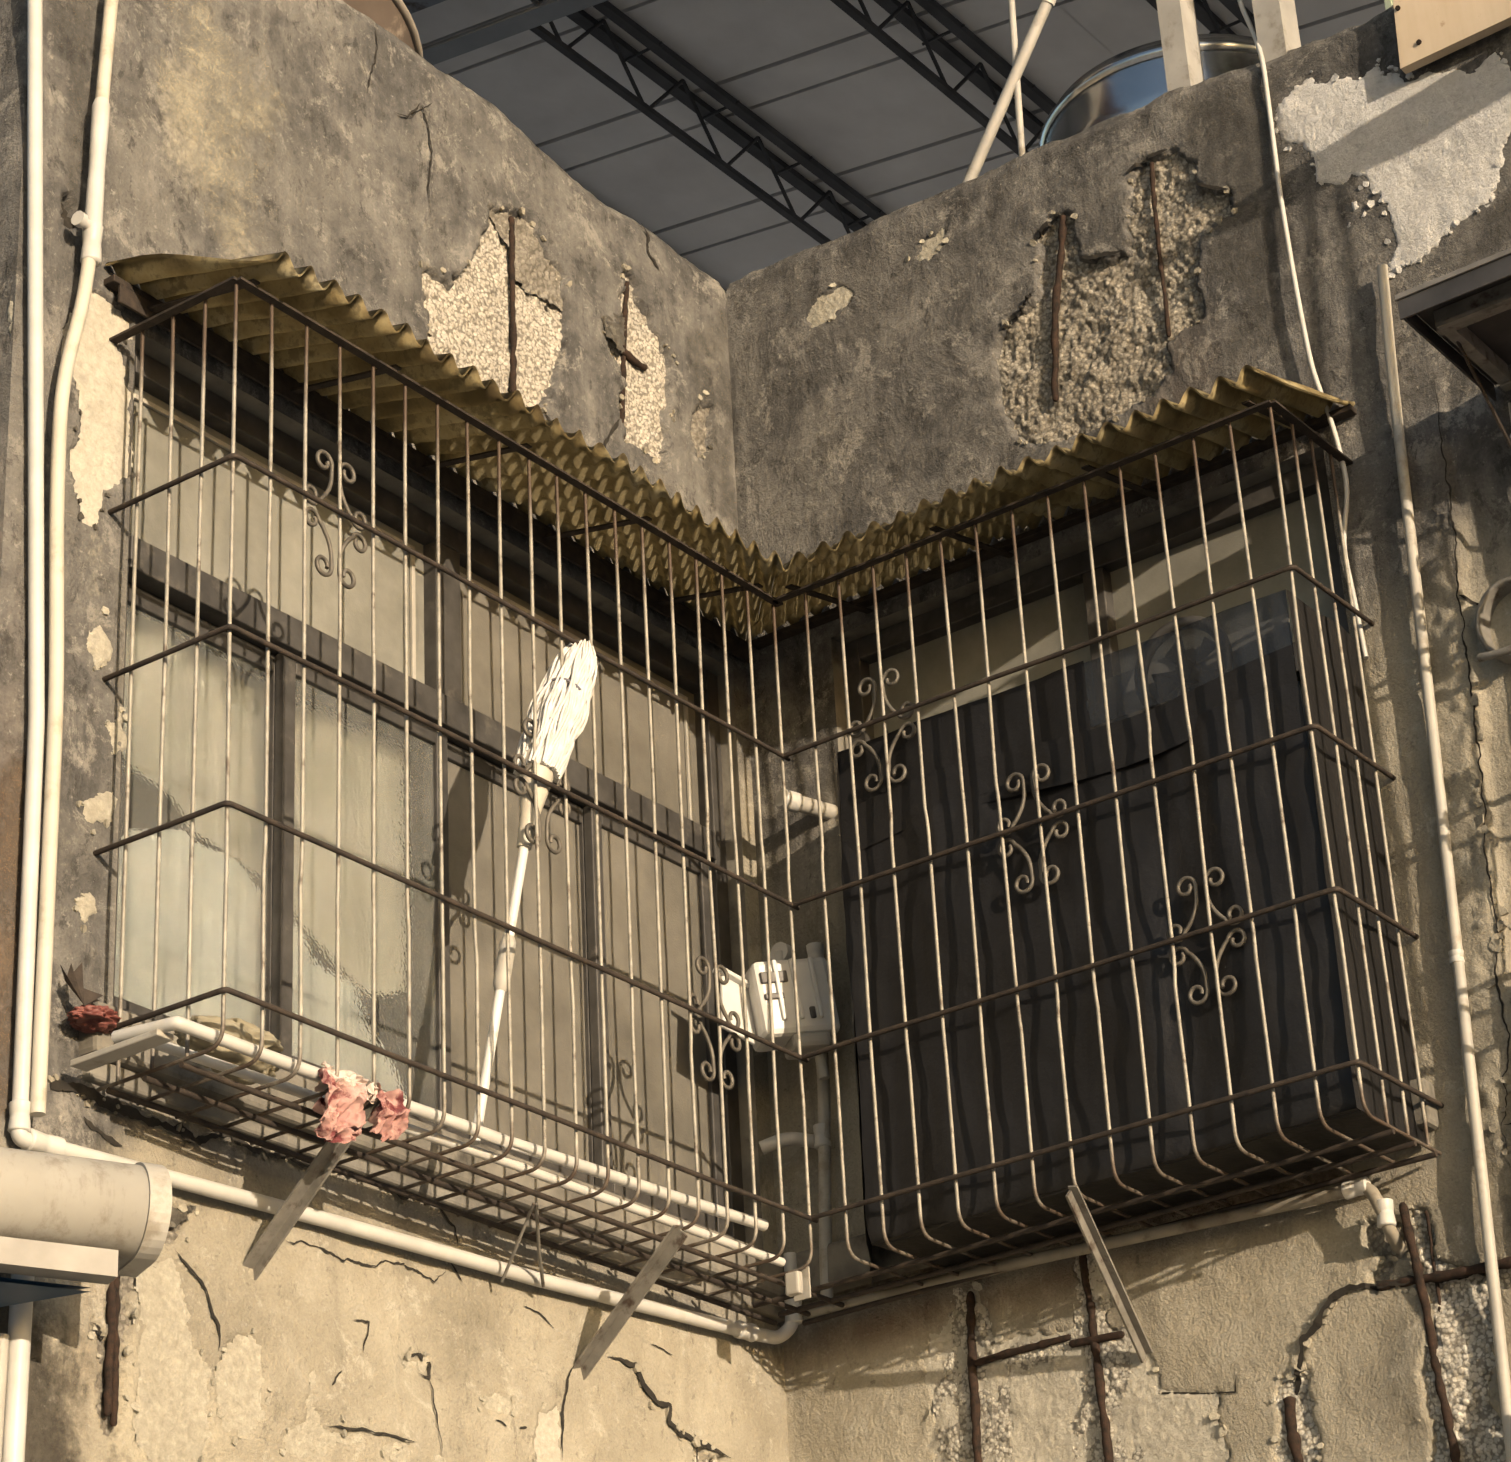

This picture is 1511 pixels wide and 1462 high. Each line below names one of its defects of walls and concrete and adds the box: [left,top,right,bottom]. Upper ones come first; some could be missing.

peeling [1274,52,1511,279]
peeling [61,293,136,530]
spalling [419,206,572,421]
spalling [602,264,713,467]
spalling [997,149,1238,445]
crack [47,1073,462,1283]
peeling [87,1202,272,1462]
crack [332,1319,370,1385]
crack [329,1353,443,1453]
crack [611,1344,731,1462]
peeling [923,1254,1237,1462]
spalling [1353,1202,1511,1462]